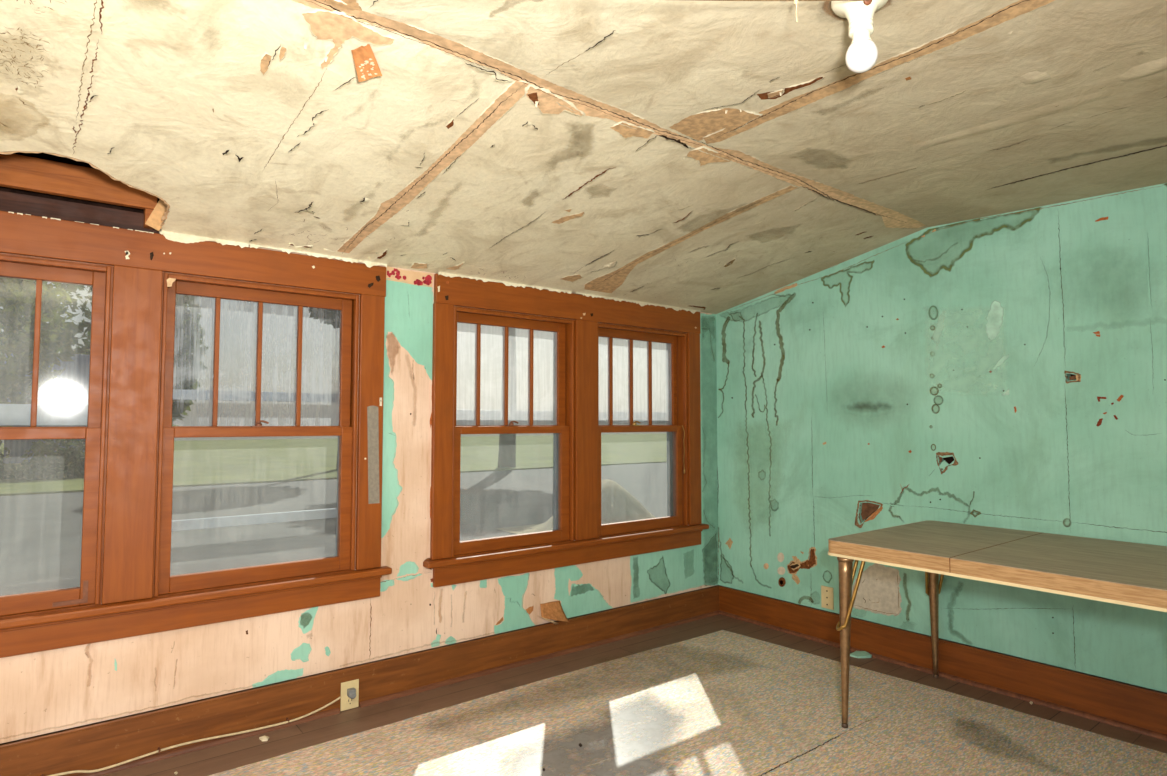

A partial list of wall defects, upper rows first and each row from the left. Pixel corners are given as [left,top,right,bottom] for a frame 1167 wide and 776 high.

crack [0,0,104,156]
peeling [586,29,958,167]
spalling [13,152,95,169]
spalling [0,186,144,214]
water stain [906,207,1041,277]
water stain [719,297,792,567]
hole [936,452,958,474]
spalling [855,500,883,528]
spalling [780,547,817,585]
peeling [479,573,534,634]